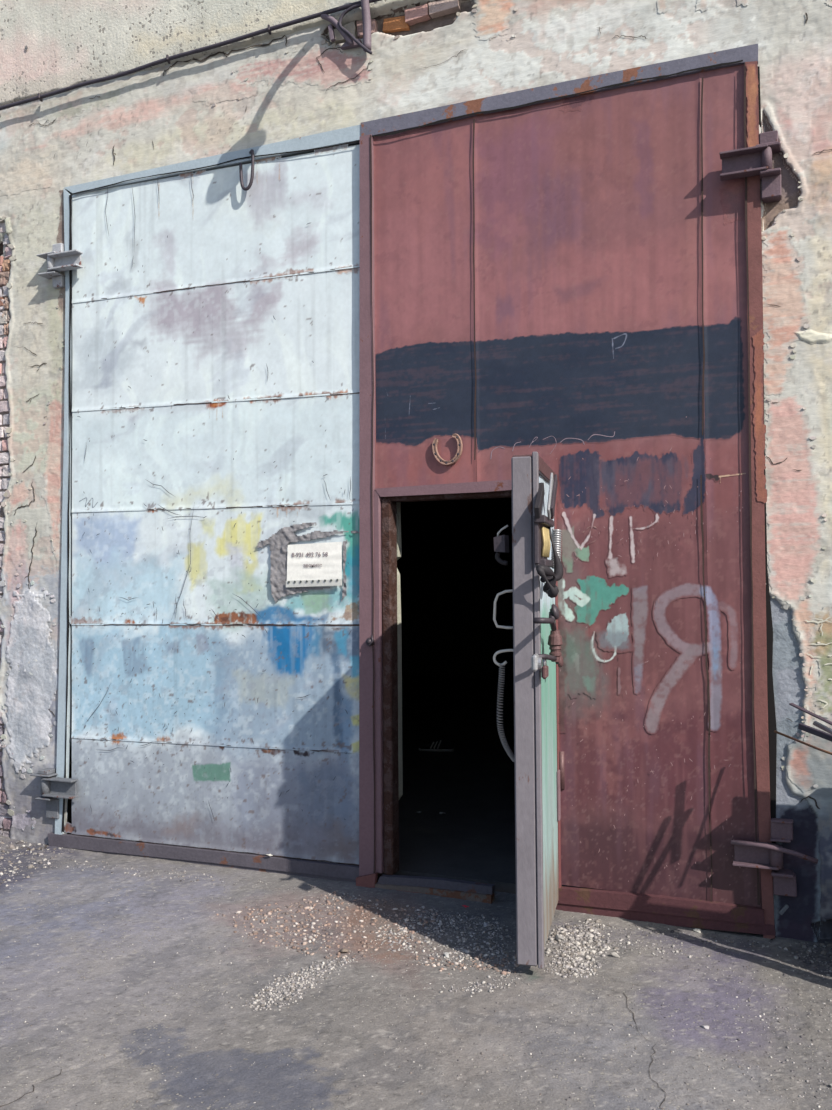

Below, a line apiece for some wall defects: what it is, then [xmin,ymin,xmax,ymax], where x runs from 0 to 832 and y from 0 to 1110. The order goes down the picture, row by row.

peeling [231,0,518,90]
corrosion [746,64,759,147]
spalling [761,111,773,133]
corrosion [99,404,145,416]
corrosion [204,398,229,421]
corrosion [243,387,350,405]
corrosion [752,329,767,503]
peeling [762,142,832,818]
peeling [0,216,65,837]
corrosion [69,615,105,628]
corrosion [166,609,265,632]
crack [624,994,666,1108]